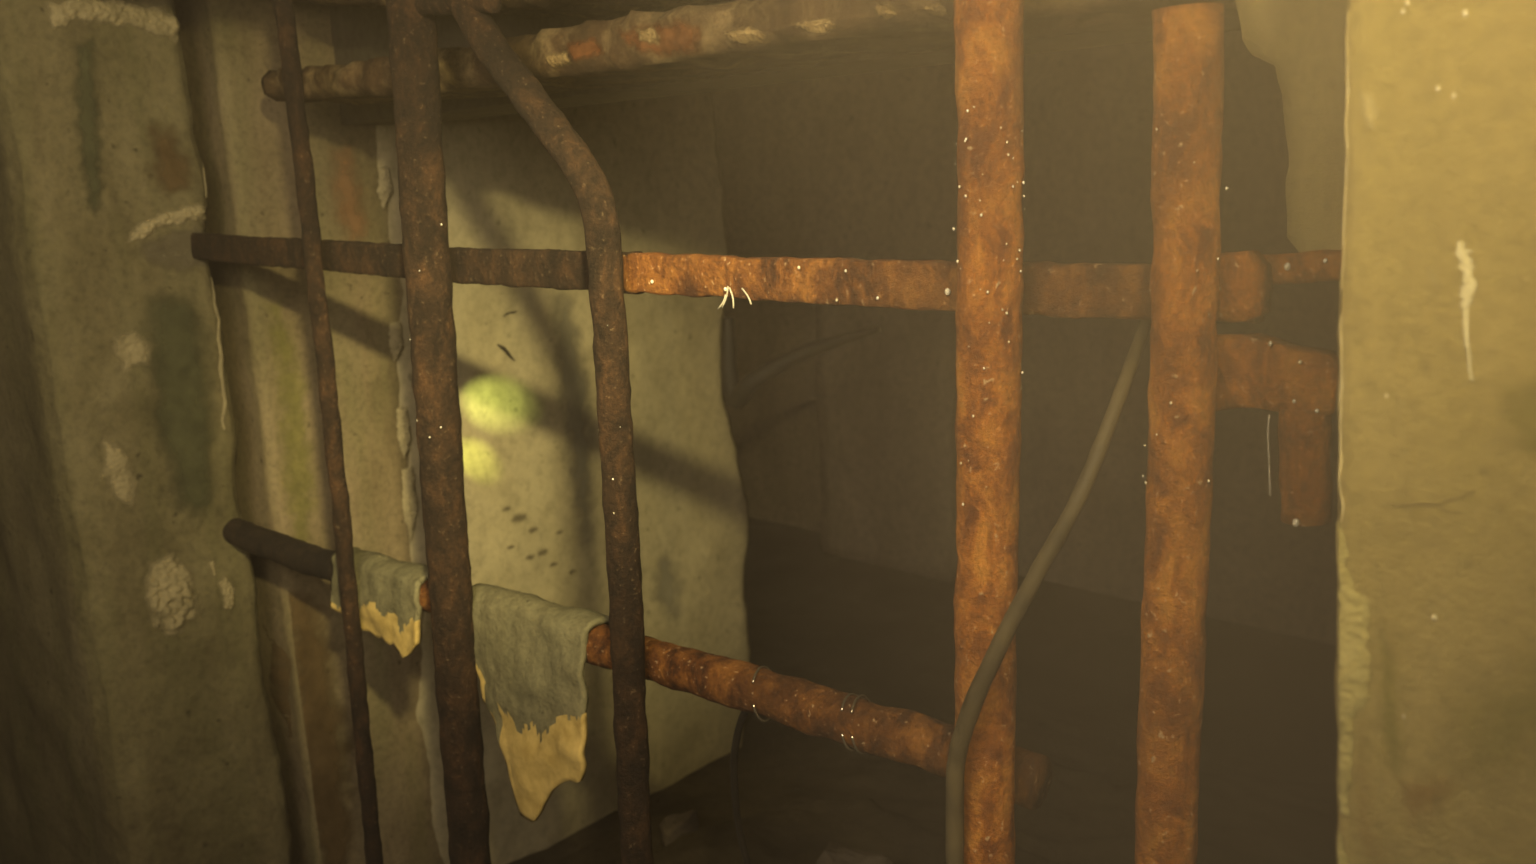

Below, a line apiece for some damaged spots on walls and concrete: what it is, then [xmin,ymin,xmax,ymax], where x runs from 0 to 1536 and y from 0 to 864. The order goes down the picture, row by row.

spalling [49,0,180,41]
leakage [76,40,102,210]
spalling [131,159,227,430]
leakage [1455,241,1476,382]
peeling [147,557,197,635]
peeling [210,561,235,609]